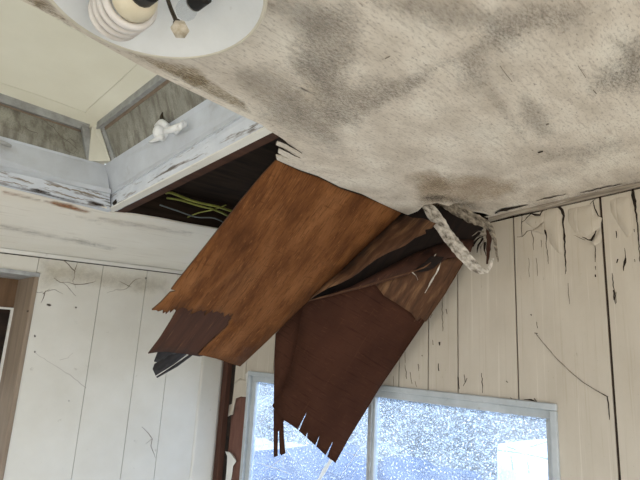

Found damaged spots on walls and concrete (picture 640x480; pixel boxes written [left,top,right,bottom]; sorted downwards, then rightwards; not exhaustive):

water stain [147,60,243,107]
crack [37,260,95,300]
peeling [375,257,462,322]
peeling [225,370,251,480]